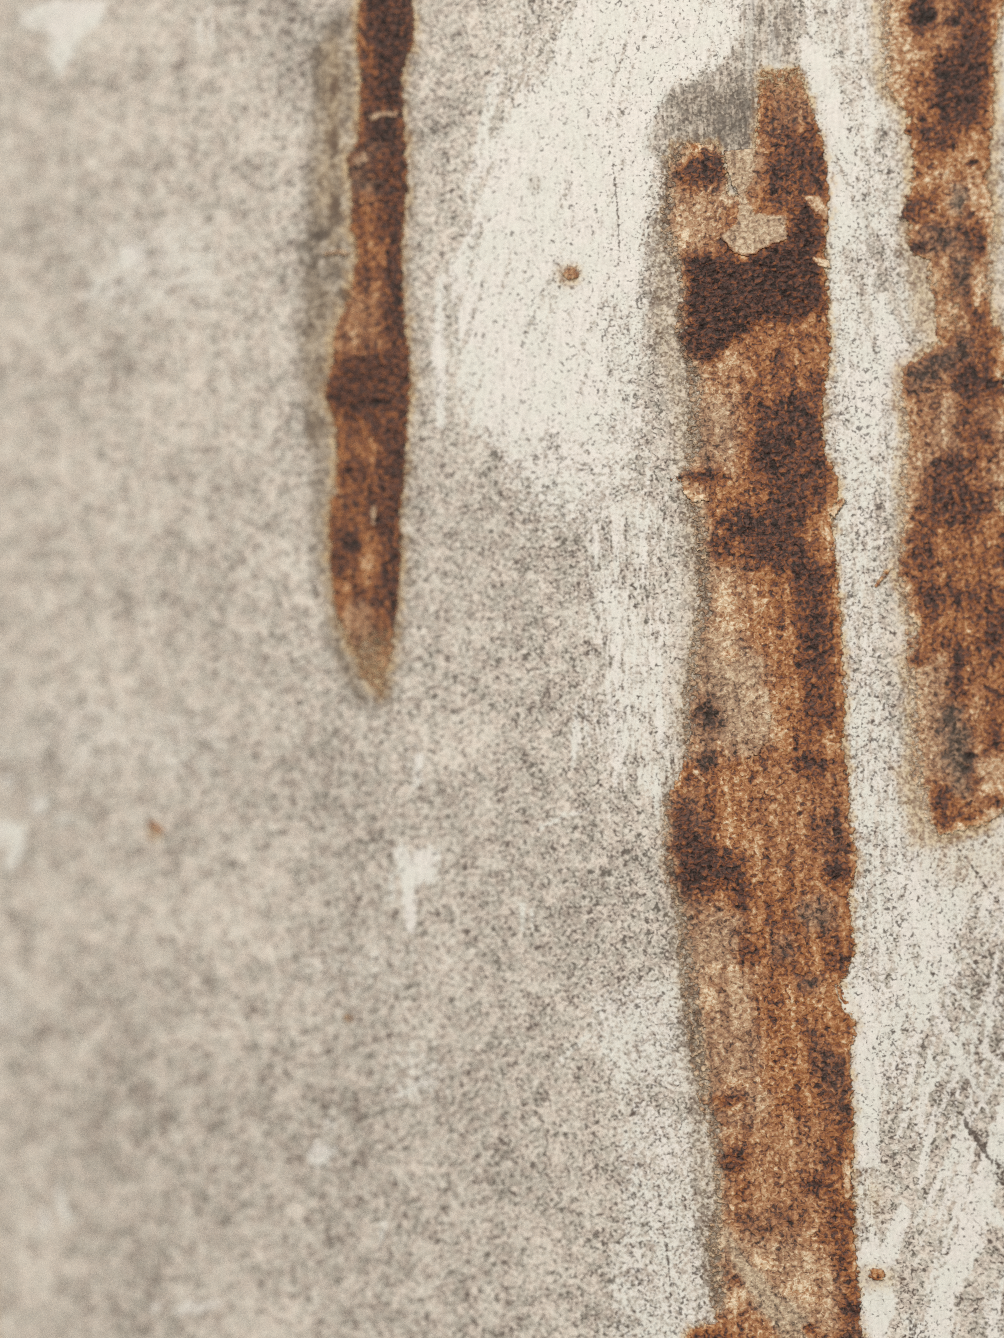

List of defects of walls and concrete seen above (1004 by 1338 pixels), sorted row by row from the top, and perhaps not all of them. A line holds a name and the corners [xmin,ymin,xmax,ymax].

corrosion [279,0,441,723]
corrosion [637,58,911,1338]
corrosion [855,0,1004,863]